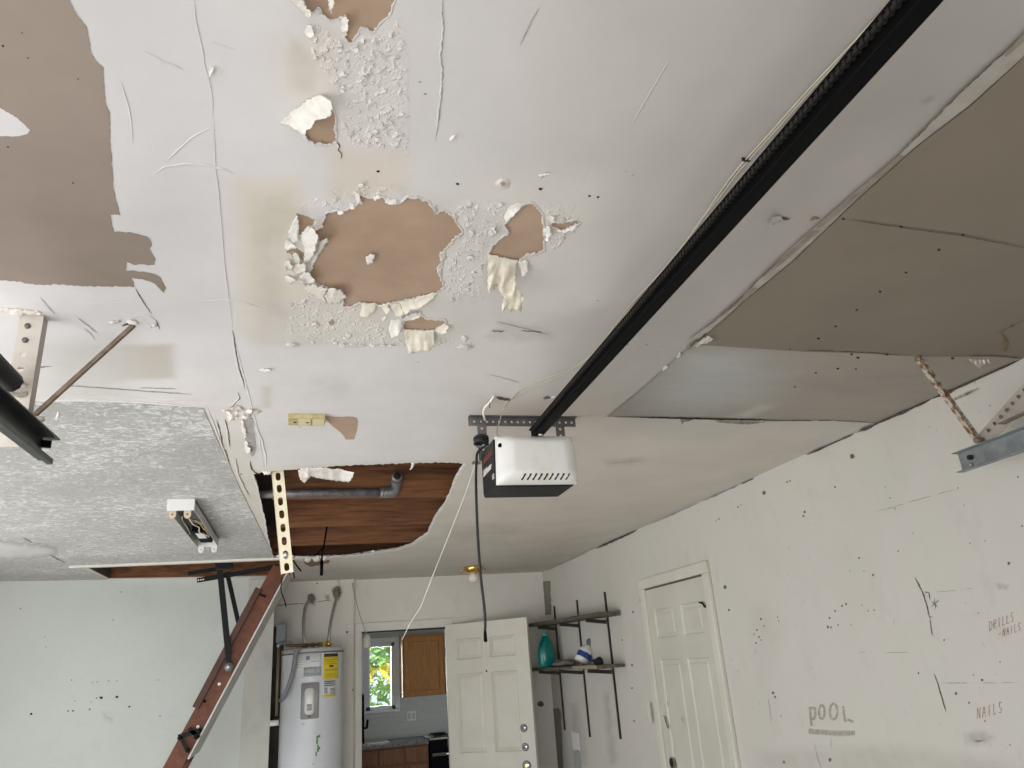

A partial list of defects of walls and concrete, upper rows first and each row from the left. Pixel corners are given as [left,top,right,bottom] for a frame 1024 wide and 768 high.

peeling [0,0,166,292]
peeling [281,0,411,158]
crack [435,0,445,140]
crack [194,0,259,497]
peeling [282,181,583,354]
peeling [325,416,358,440]
crack [915,578,970,635]